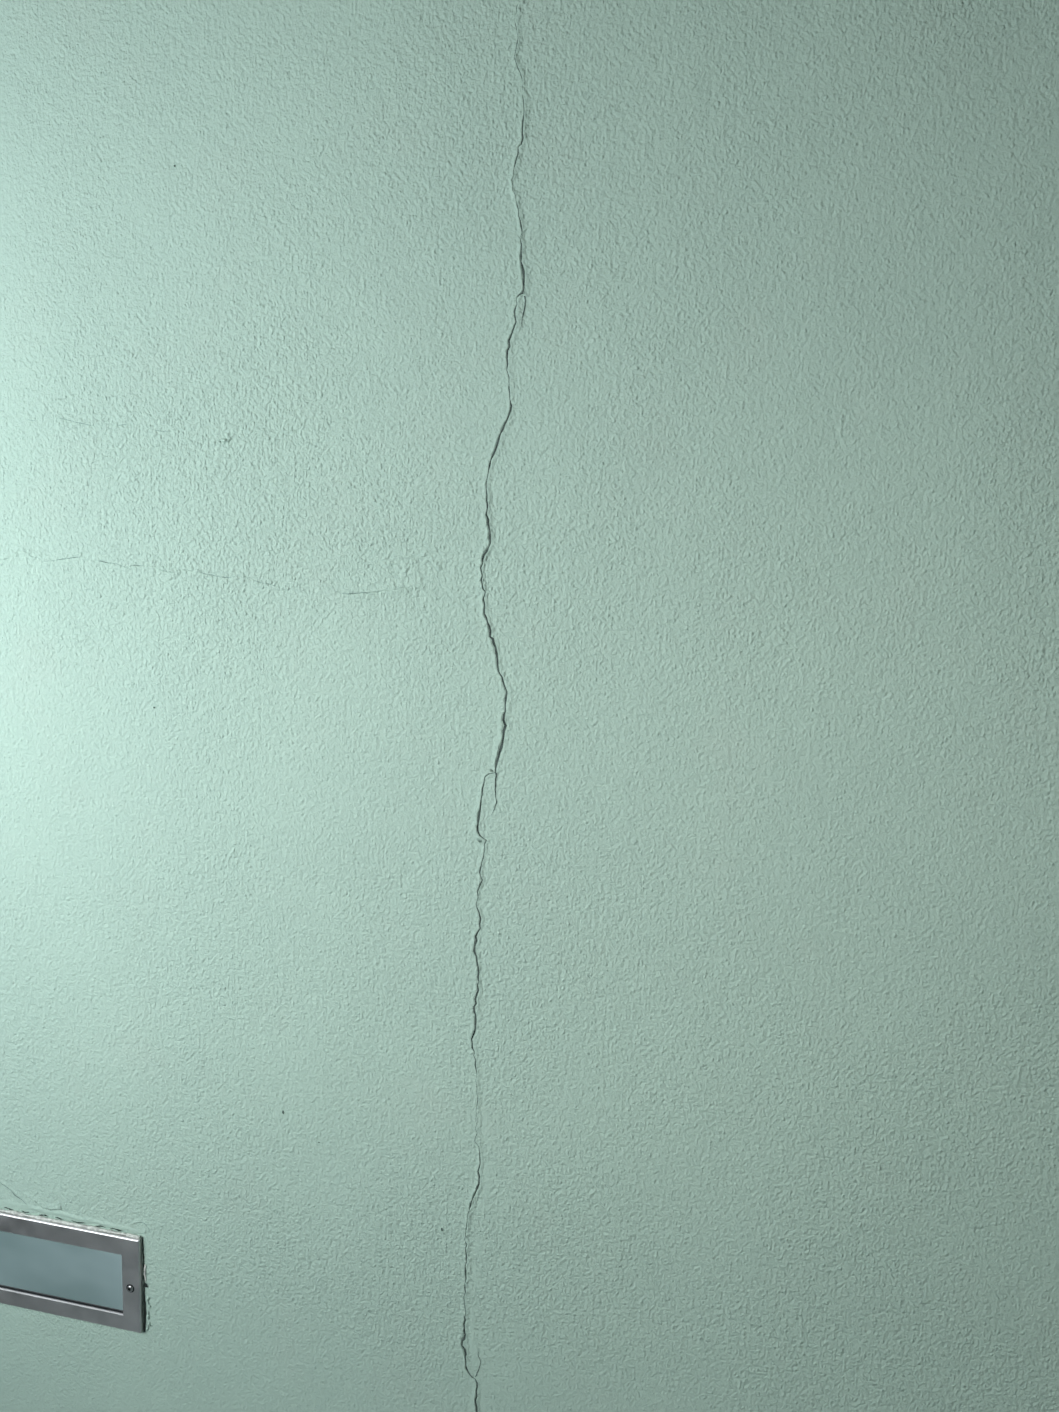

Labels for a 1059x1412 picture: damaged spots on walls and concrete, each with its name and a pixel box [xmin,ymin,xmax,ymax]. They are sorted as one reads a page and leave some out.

crack [456,0,531,1412]